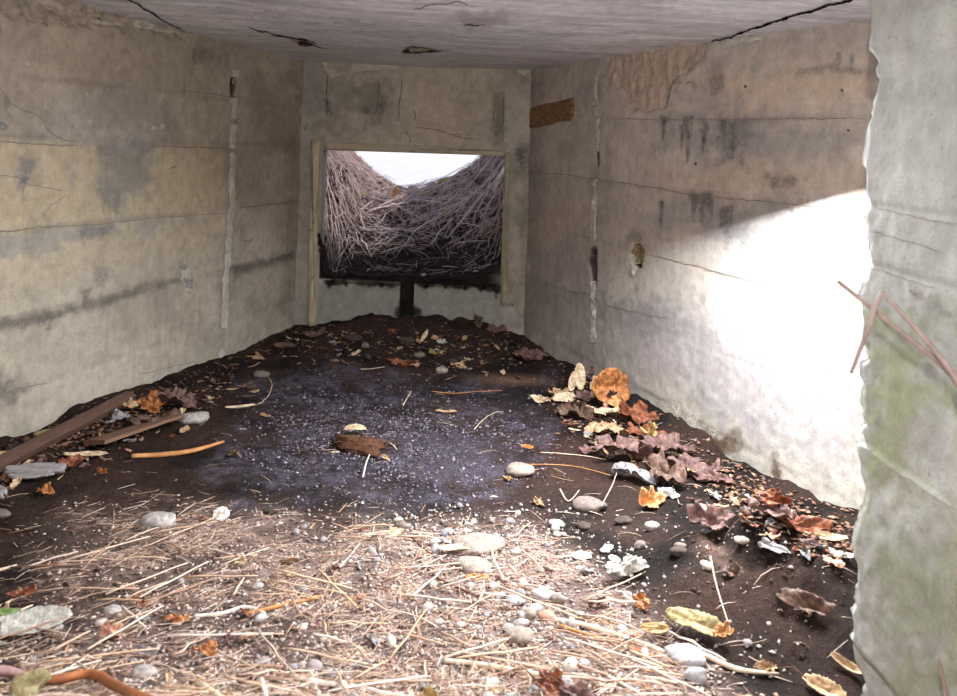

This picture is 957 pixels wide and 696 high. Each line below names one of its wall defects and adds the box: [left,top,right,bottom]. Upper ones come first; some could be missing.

crack [129,0,184,32]
crack [710,0,853,43]
peeling [608,43,705,113]